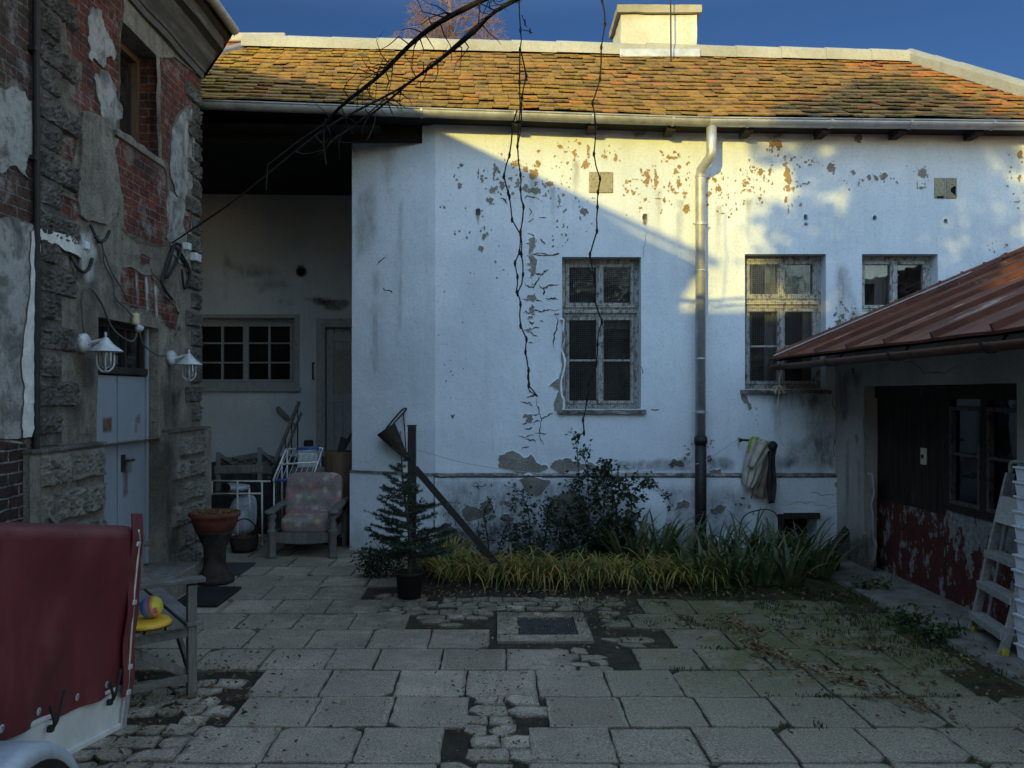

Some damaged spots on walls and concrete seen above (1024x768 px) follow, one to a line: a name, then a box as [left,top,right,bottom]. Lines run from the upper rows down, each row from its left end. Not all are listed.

peeling [0,86,33,180]
spalling [62,0,201,334]
peeling [454,139,621,253]
peeling [622,150,691,222]
peeling [706,139,899,215]
peeling [906,165,929,190]
crack [500,195,560,347]
spalling [548,318,566,411]
spalling [431,450,600,546]
crack [517,389,553,449]
spalling [668,443,692,469]